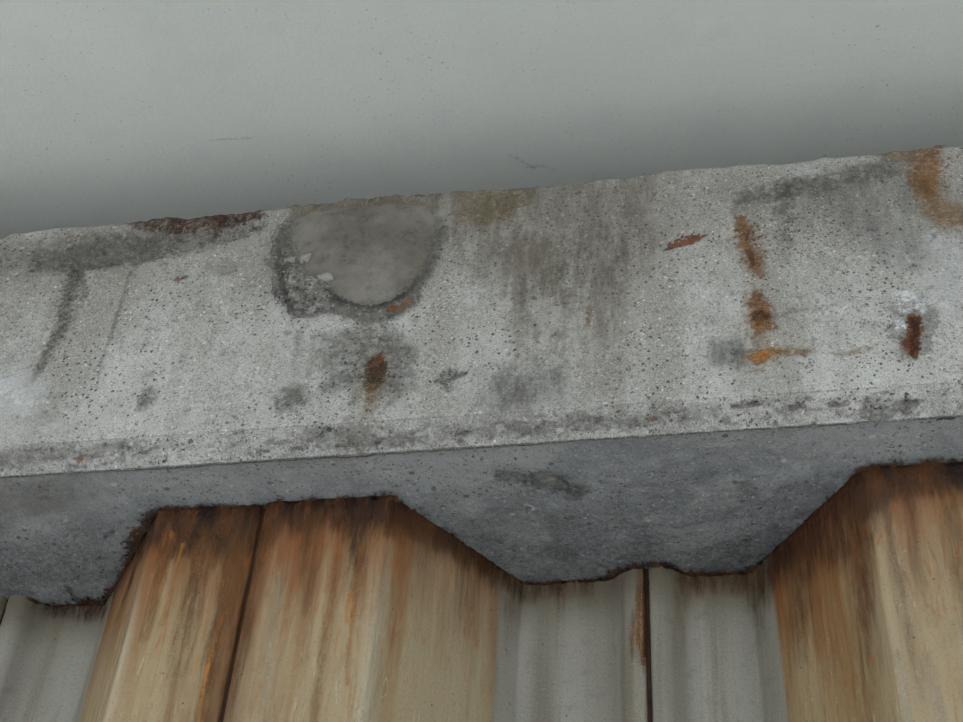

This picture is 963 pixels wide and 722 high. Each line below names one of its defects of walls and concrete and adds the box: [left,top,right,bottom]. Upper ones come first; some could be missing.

corrosion [882,145,963,225]
corrosion [129,210,264,234]
corrosion [663,231,707,250]
corrosion [735,216,765,272]
corrosion [748,291,777,334]
corrosion [886,296,940,360]
corrosion [366,338,387,390]
corrosion [747,348,789,365]
corrosion [28,458,963,721]